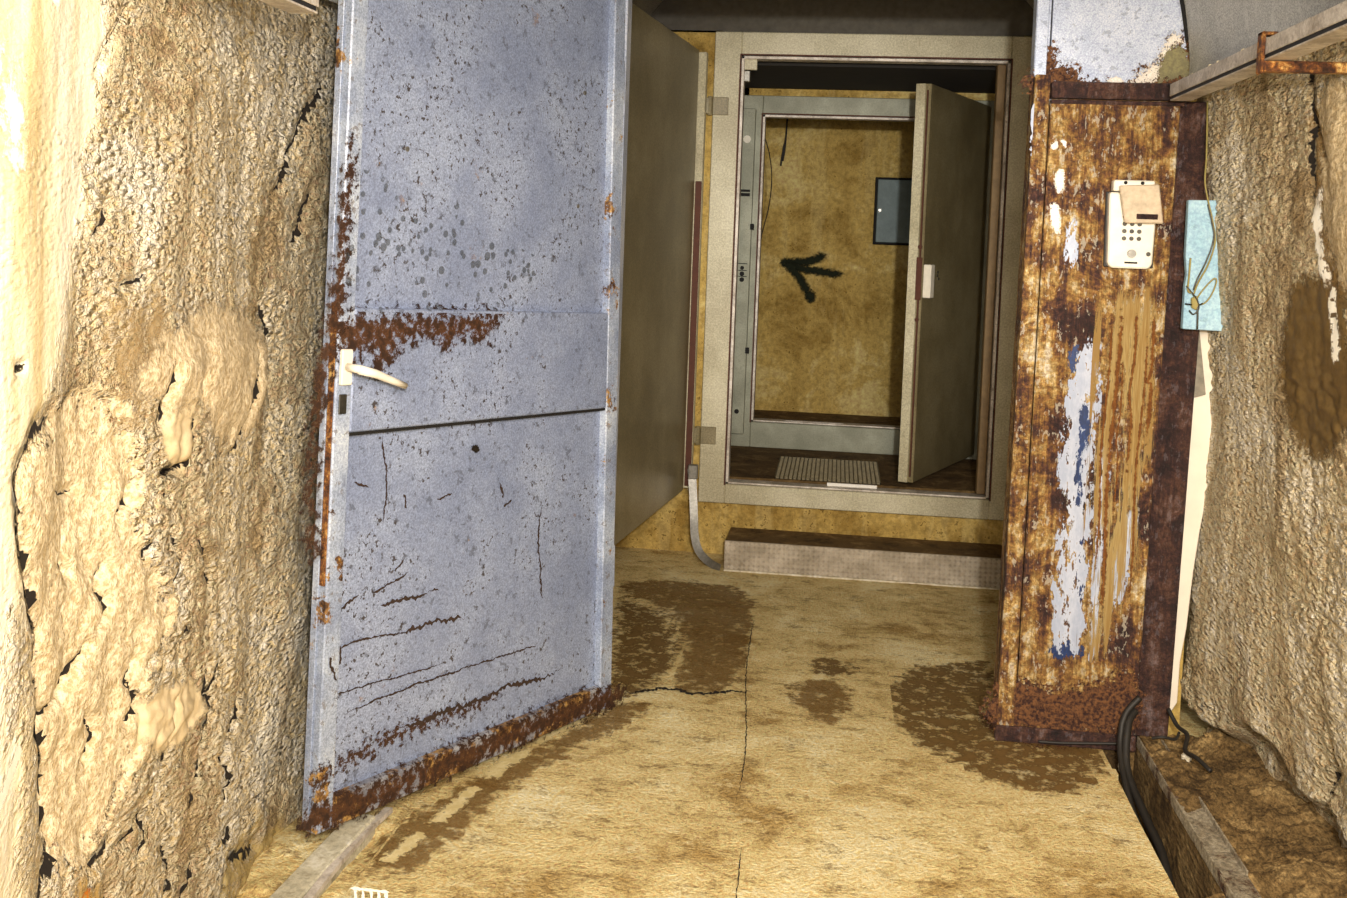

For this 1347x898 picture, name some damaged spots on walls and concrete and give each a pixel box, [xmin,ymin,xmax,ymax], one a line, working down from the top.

corrosion [298,130,535,566]
corrosion [890,286,1163,795]
peeling [1050,169,1079,269]
peeling [1048,338,1139,661]
leakage [1279,112,1347,467]
corrosion [296,681,627,842]
leakage [365,580,756,875]
crack [1330,749,1341,794]